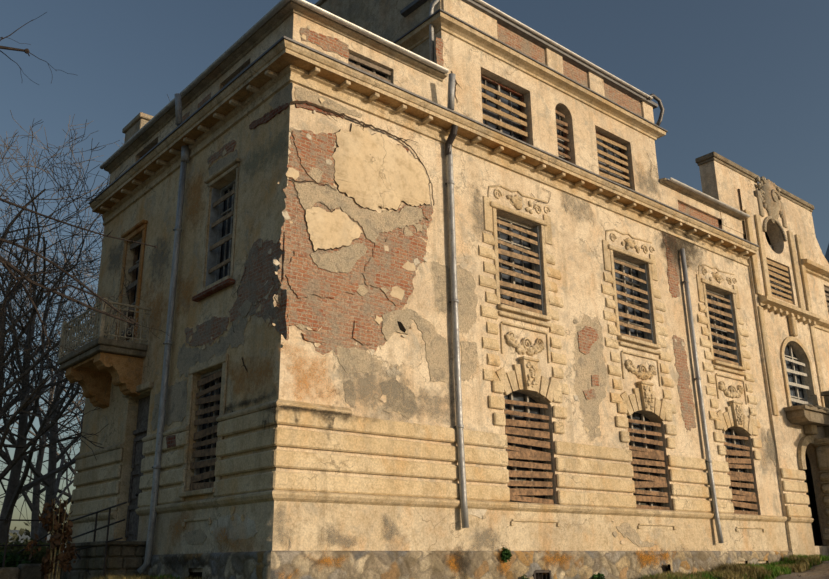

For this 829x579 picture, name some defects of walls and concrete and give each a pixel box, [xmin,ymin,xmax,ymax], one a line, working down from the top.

flaking render [300,26,349,59]
flaking render [249,98,345,130]
flaking render [184,127,433,359]
flaking render [662,232,680,298]
water stain [343,371,449,418]
flaking render [571,313,609,444]
flaking render [672,335,696,431]